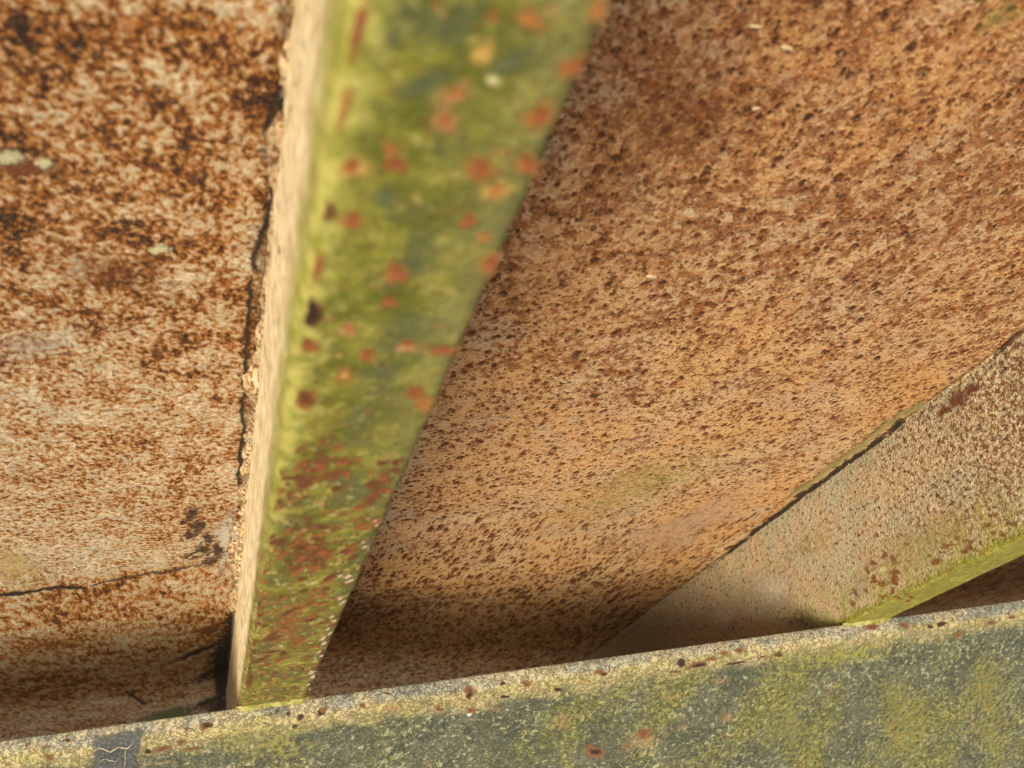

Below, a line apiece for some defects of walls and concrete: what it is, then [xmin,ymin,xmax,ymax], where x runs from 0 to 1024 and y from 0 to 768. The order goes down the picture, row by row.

rust [348,7,368,62]
rust [472,42,499,85]
rust [338,155,370,178]
rust [468,158,513,199]
rust [322,201,361,228]
crack [236,85,284,487]
rust [301,298,322,353]
rust [295,391,316,409]
crack [0,553,206,597]
rust [246,439,404,689]
rust [850,552,914,609]
rust [928,536,974,565]